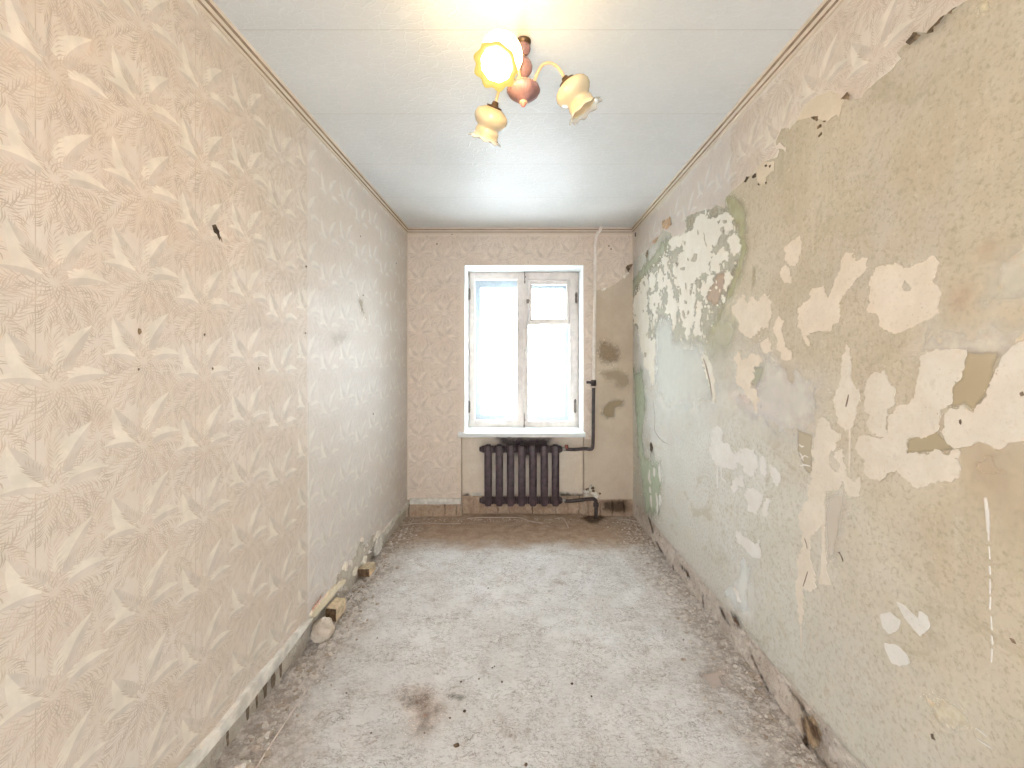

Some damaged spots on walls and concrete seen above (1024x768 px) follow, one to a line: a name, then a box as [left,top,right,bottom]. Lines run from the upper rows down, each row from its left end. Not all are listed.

peeling [633,206,792,413]
peeling [780,235,803,283]
peeling [797,249,942,346]
peeling [709,425,781,517]
peeling [795,341,1024,649]
flaking render [196,485,867,768]